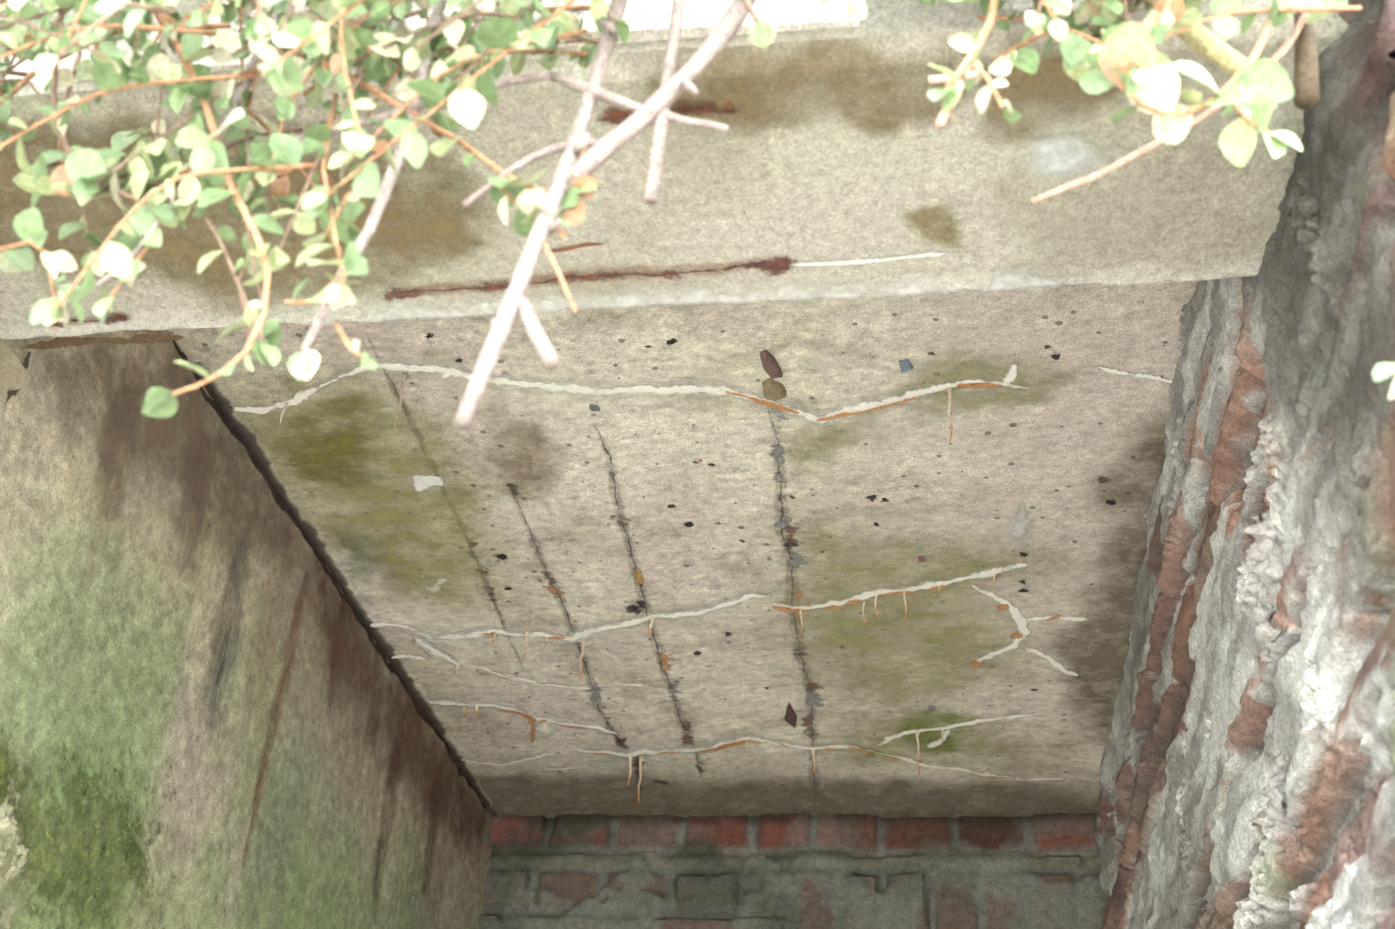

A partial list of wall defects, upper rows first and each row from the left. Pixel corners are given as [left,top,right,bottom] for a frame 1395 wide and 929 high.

damp [910,209,955,242]
rust [529,256,797,284]
rust [385,281,510,301]
damp [411,475,444,492]
crack [168,332,1088,817]
damp [211,595,240,698]
spalling [0,759,32,929]